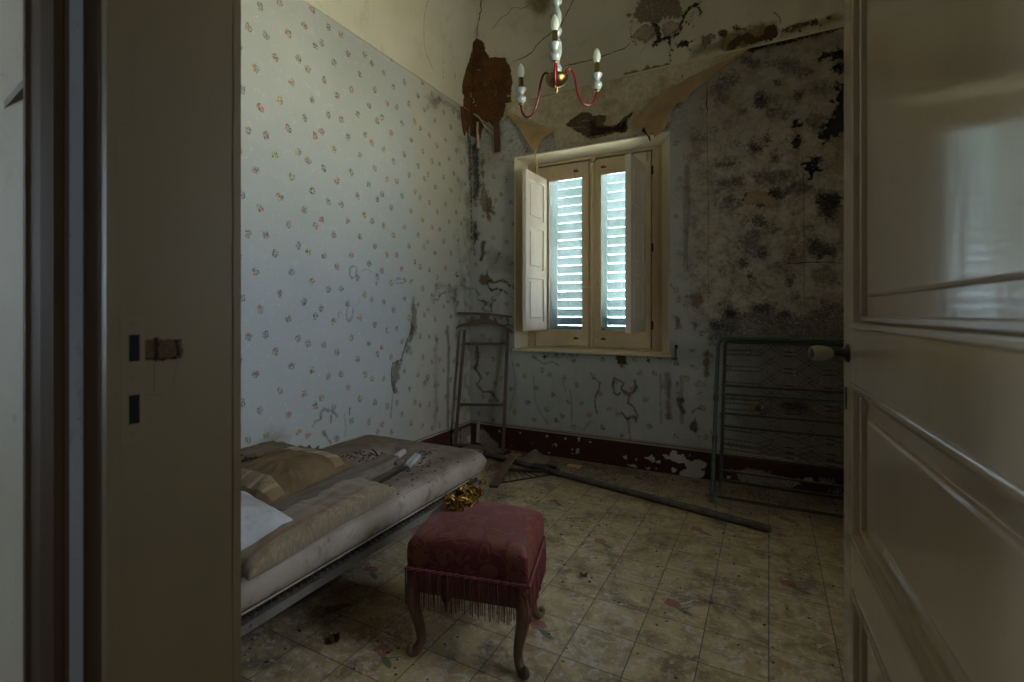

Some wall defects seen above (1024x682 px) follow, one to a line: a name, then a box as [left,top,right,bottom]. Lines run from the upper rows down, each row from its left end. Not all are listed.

crack [515,0,574,61]
crack [563,41,631,67]
flaking render [460,47,750,171]
damp [785,119,803,149]
damp [800,47,844,180]
damp [806,191,841,260]
damp [691,302,844,377]
peeling [623,450,707,478]